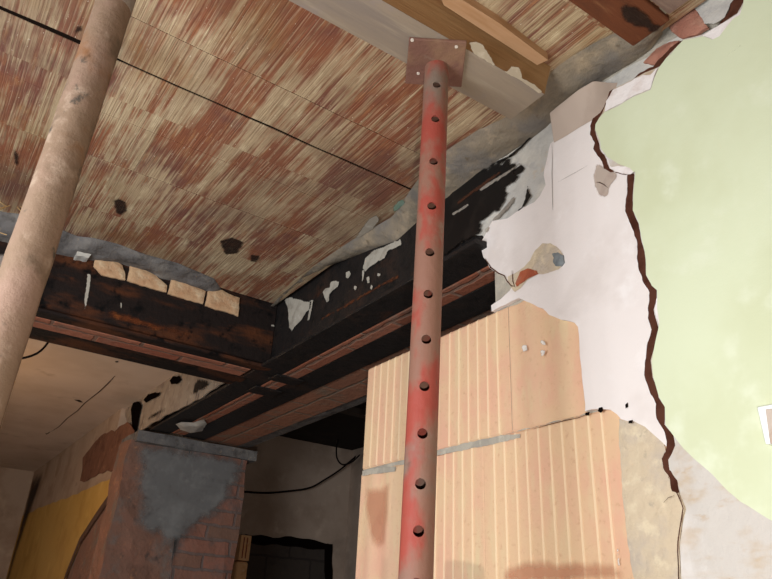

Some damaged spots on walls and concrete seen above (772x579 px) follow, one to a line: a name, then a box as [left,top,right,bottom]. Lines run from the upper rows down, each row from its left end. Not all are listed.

flaking render [643,9,710,66]
crack [702,0,743,39]
flaking render [485,243,565,292]
crack [552,41,684,579]
crack [46,361,118,434]
flaking render [80,372,224,482]